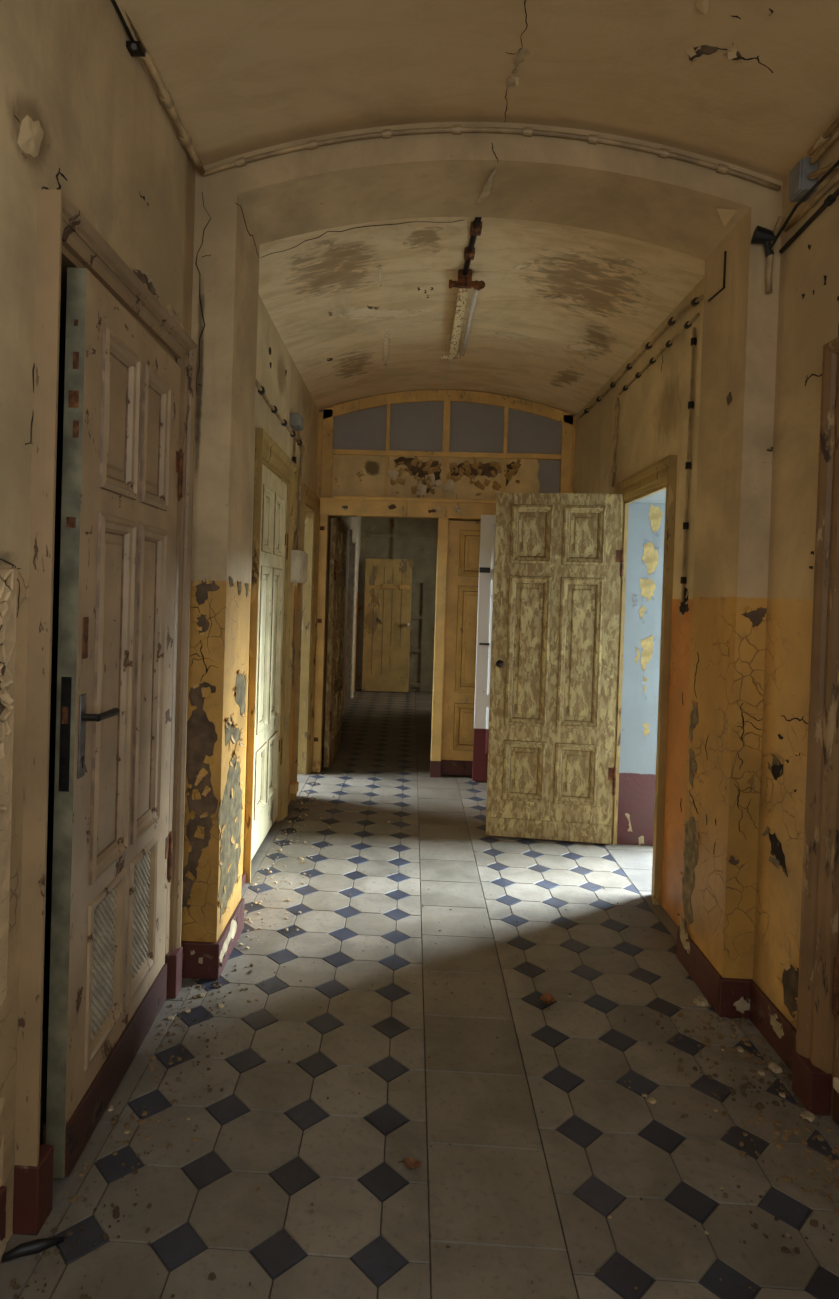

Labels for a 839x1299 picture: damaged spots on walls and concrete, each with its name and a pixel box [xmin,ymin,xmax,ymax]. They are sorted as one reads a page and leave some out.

crack [505,0,528,55]
crack [717,8,774,73]
crack [491,90,508,162]
peeling [390,456,522,513]
peeling [192,576,251,636]
peeling [741,606,767,631]
peeling [0,567,17,1006]
spalling [768,751,800,780]
peeling [182,670,247,967]
spalling [762,826,788,877]